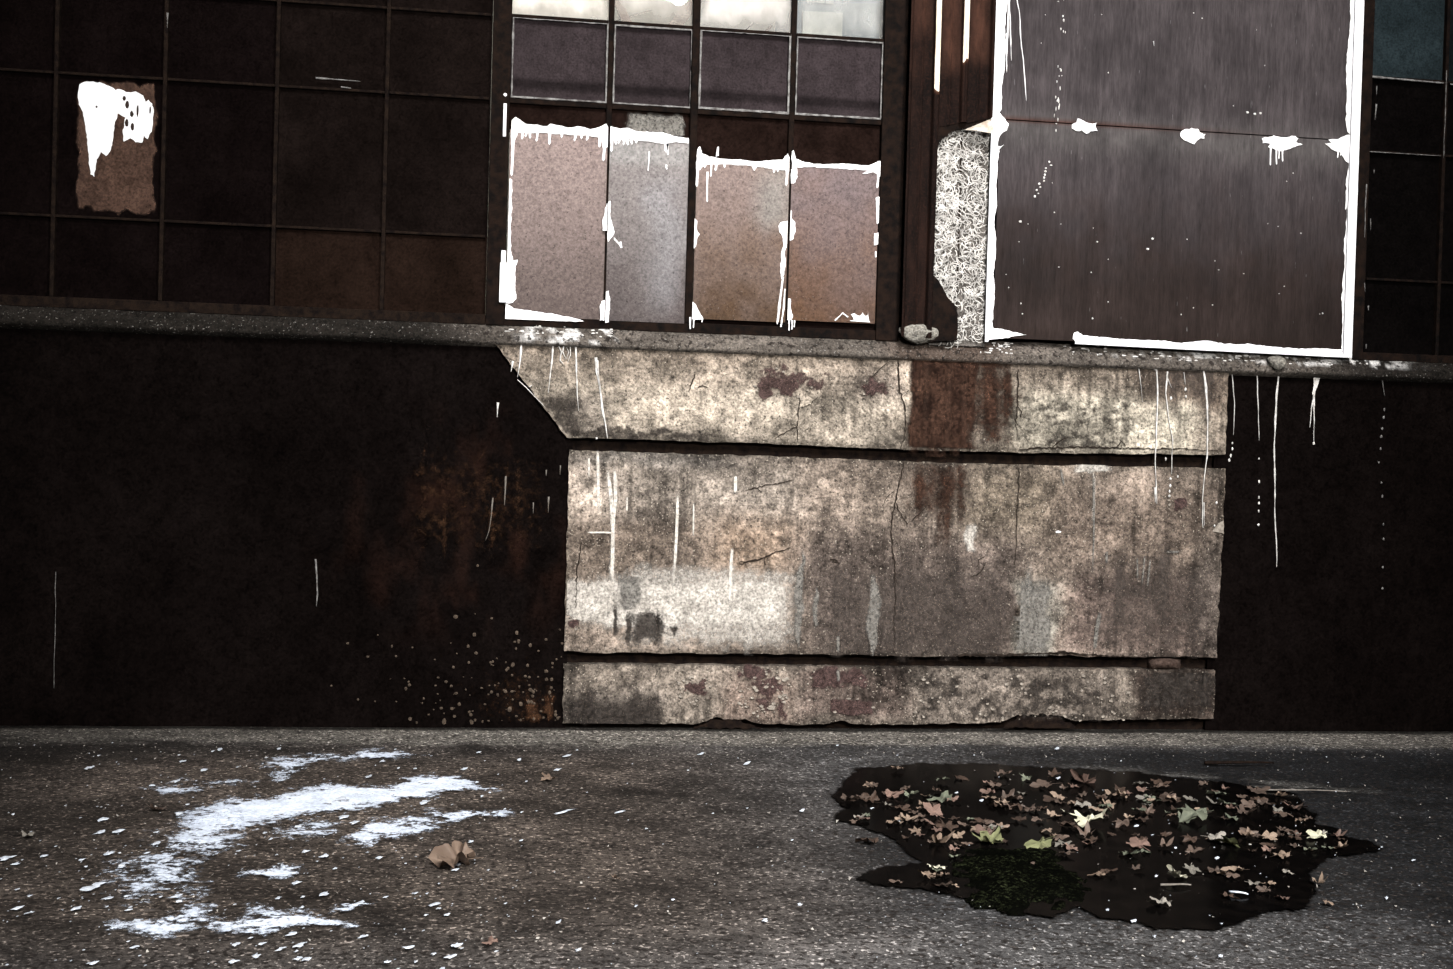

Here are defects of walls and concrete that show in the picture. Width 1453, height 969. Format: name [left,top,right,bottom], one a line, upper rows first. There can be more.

peeling [78,81,154,176]
damp [511,361,712,442]
rust [908,360,1013,539]
damp [589,470,628,547]
damp [964,525,977,551]
damp [566,565,791,645]
damp [834,571,1051,653]
rust [526,695,554,722]
damp [564,689,664,724]